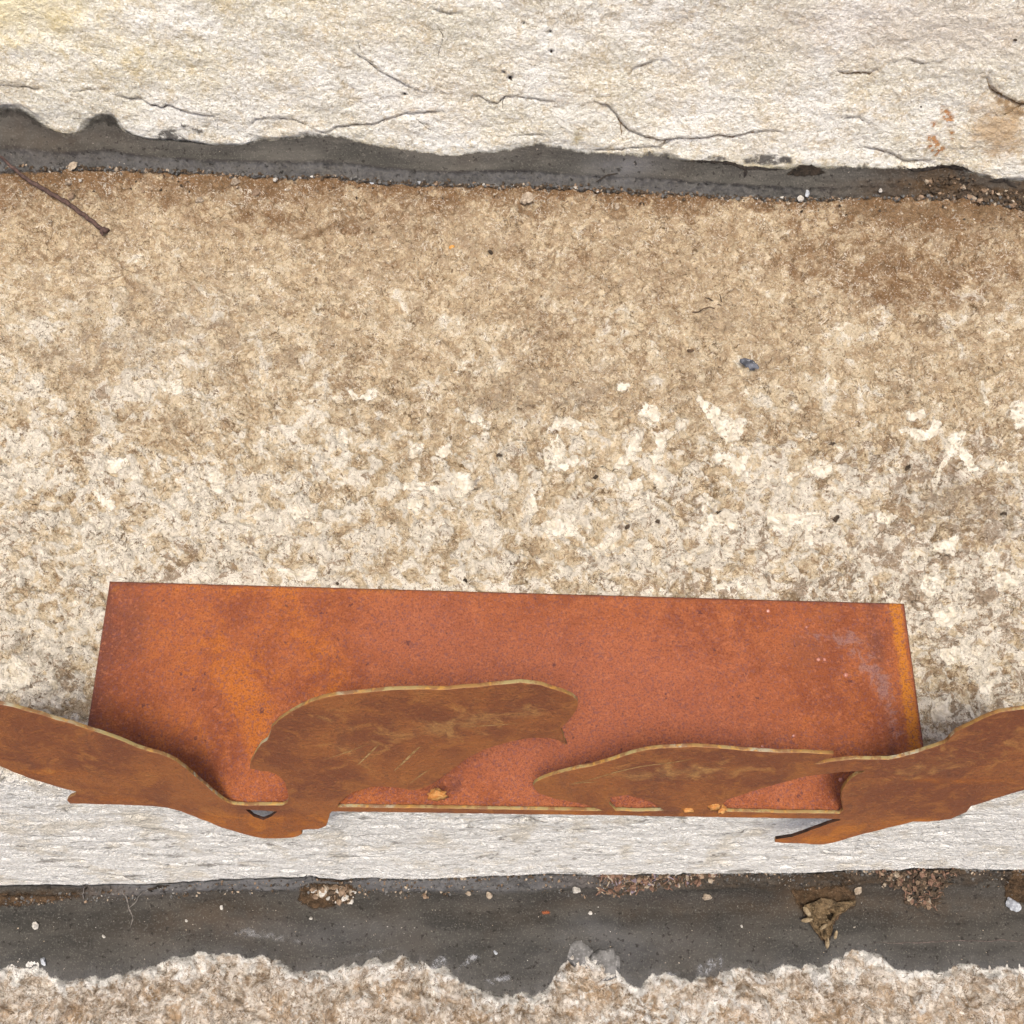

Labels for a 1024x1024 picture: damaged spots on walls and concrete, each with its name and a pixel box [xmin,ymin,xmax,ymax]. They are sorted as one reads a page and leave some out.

crack [986,78,1022,116]
crack [585,102,778,182]
crack [853,117,1018,189]